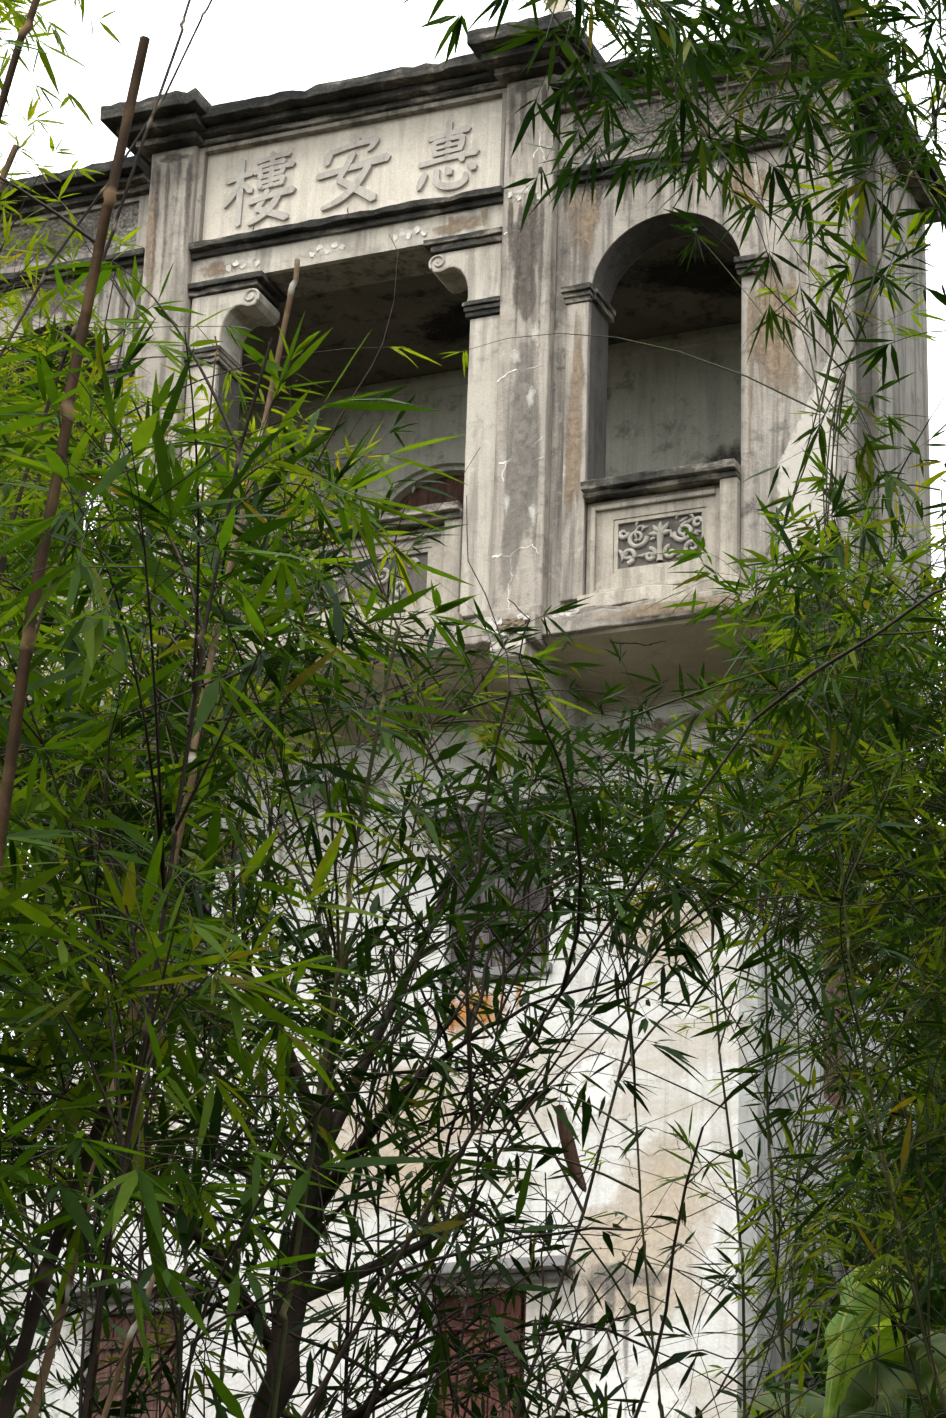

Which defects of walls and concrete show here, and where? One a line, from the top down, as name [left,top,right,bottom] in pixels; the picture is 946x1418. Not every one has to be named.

damp [438,209,487,234]
damp [563,167,695,253]
damp [715,160,770,200]
damp [502,193,544,583]
damp [564,322,584,503]
damp [631,247,797,466]
damp [578,1155,709,1353]